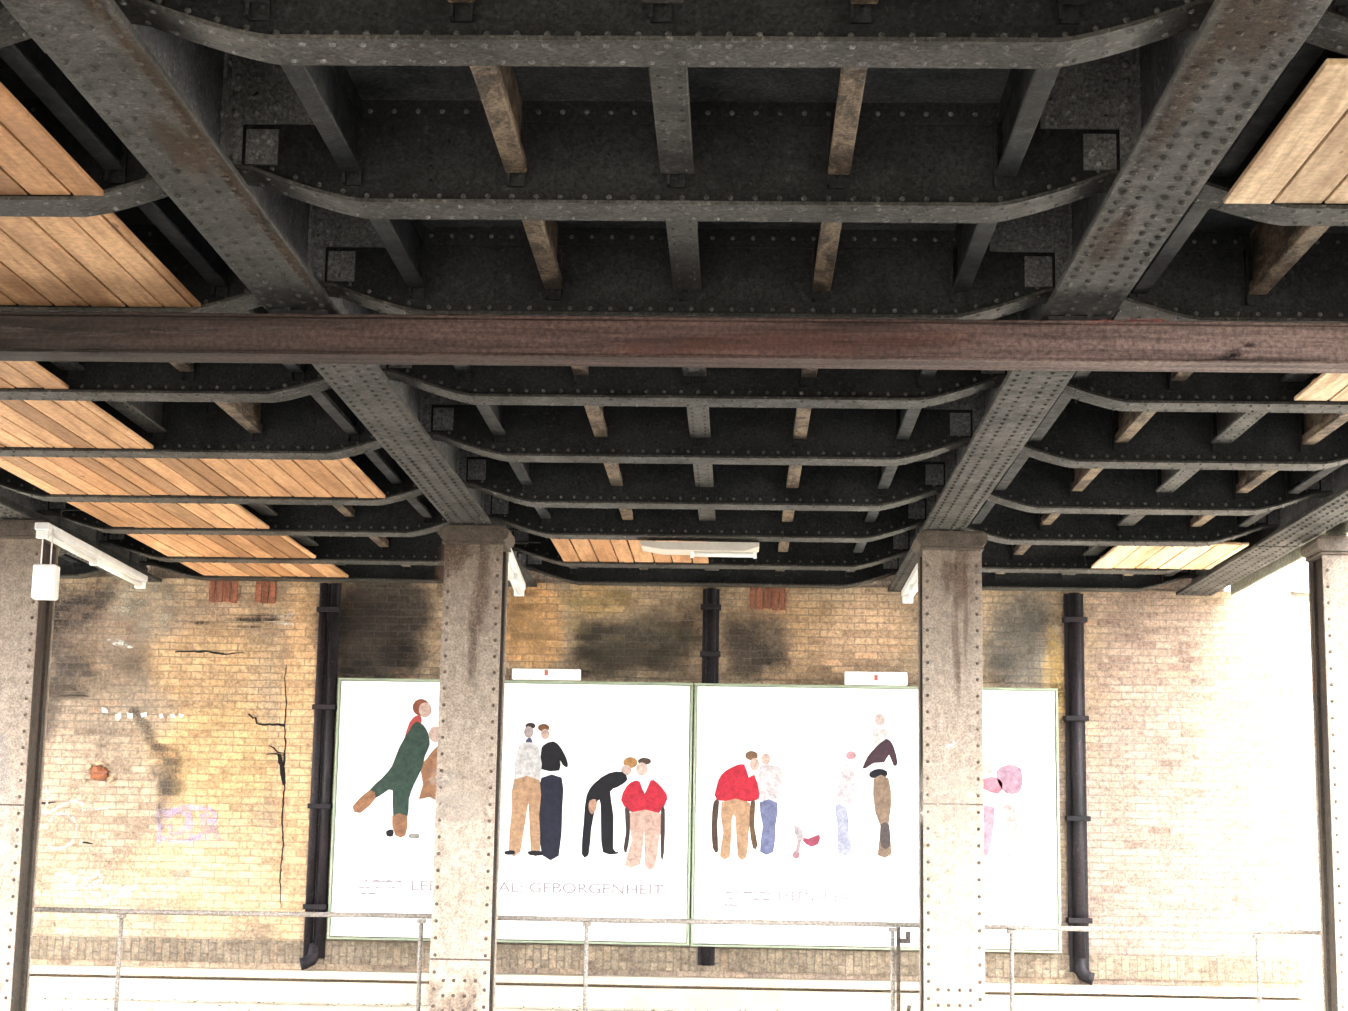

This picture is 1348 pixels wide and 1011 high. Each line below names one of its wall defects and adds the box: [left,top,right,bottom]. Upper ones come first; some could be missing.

leakage [68,582,171,626]
leakage [237,612,293,628]
leakage [130,709,181,809]
crack [248,665,287,908]